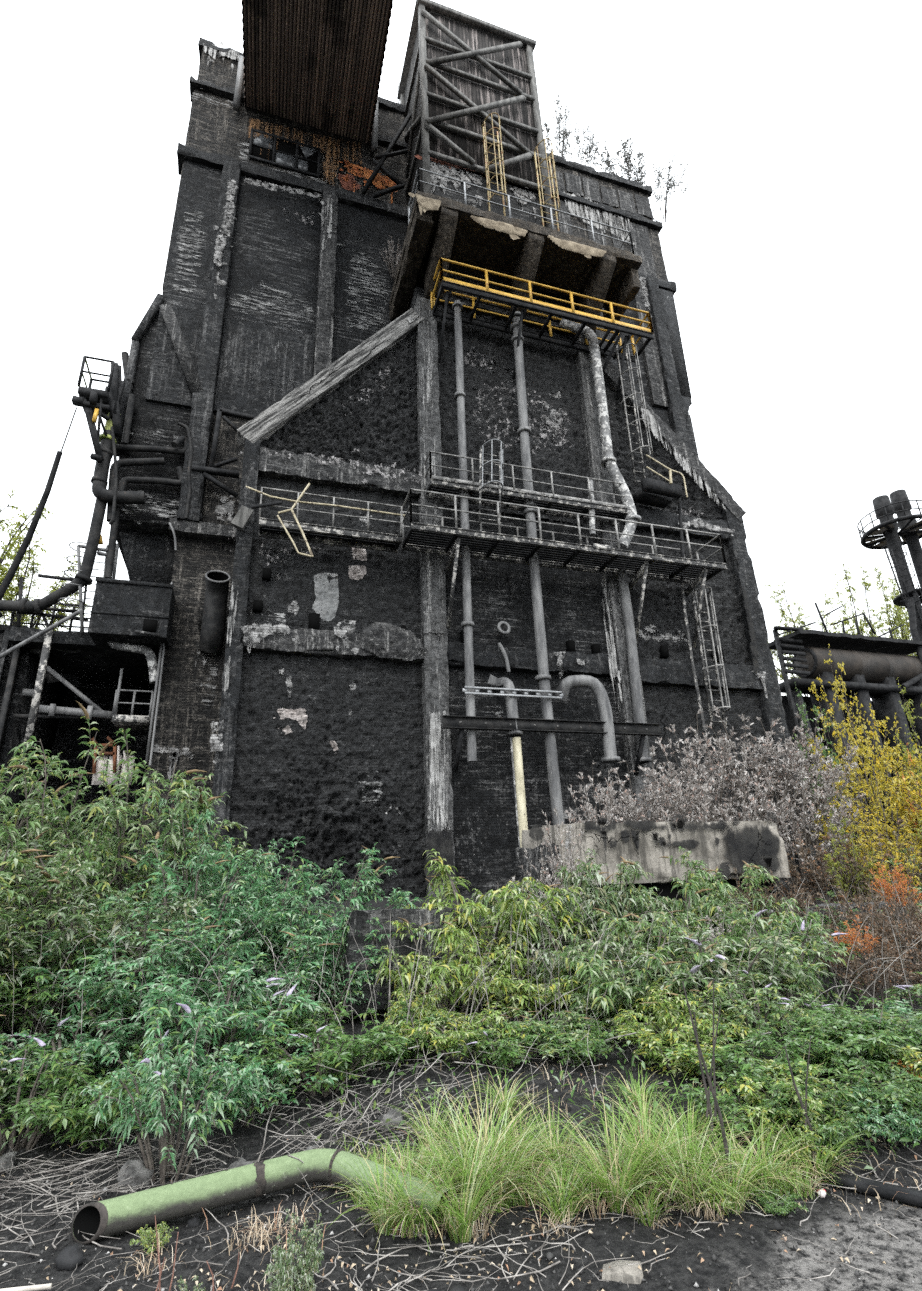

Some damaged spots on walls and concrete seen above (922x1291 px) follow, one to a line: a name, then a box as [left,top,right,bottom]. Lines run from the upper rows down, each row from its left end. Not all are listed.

rust [249,118,398,203]
peeling [348,547,367,580]
peeling [273,668,308,735]
water stain [529,824,544,841]
water stain [584,812,783,894]